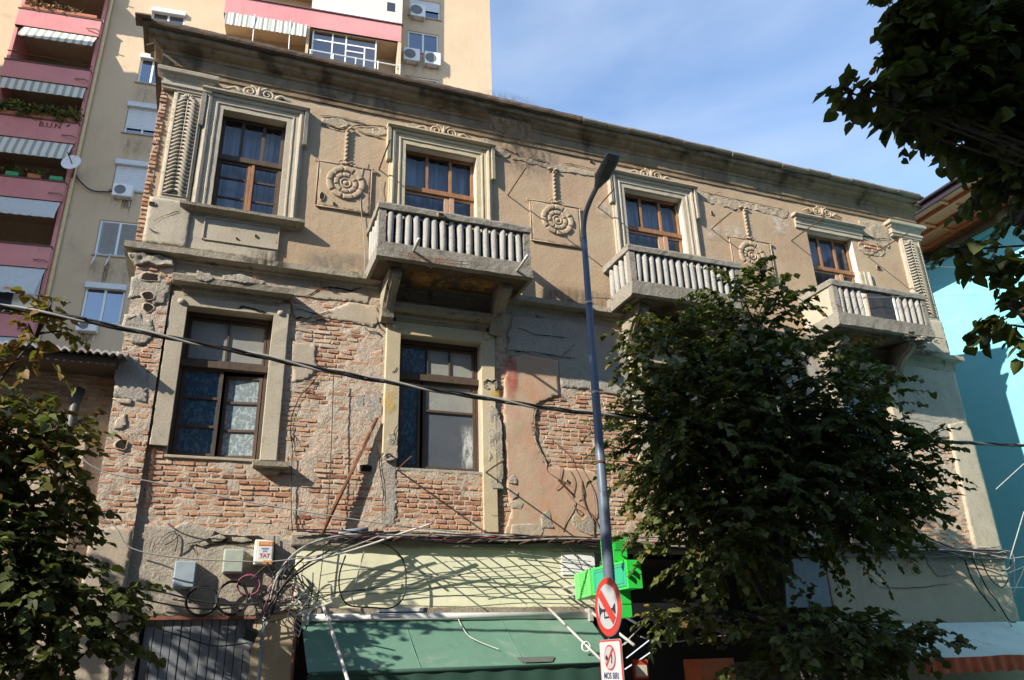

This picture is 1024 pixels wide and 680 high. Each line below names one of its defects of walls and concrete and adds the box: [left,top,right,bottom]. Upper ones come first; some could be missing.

crack [296,286,362,323]
flaking render [291,302,380,328]
flaking render [112,252,173,451]
flaking render [291,341,318,382]
crack [510,327,579,359]
flaking render [503,354,624,538]
spalling [357,464,375,473]